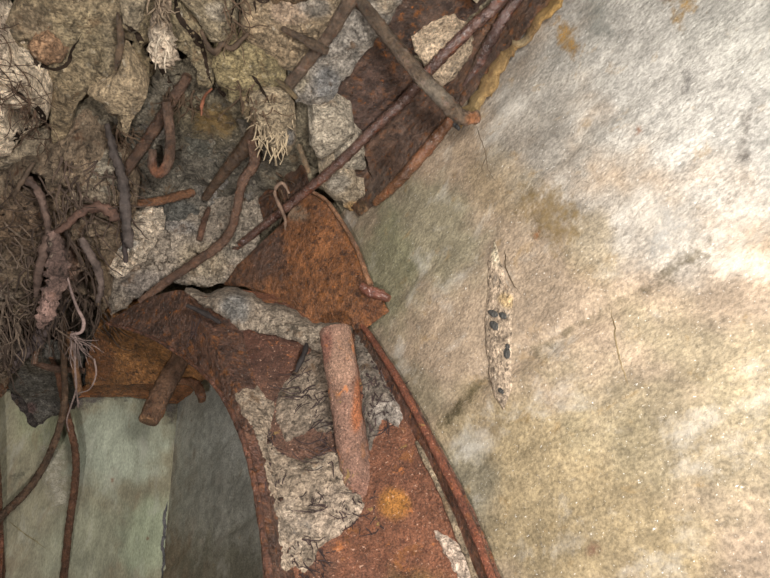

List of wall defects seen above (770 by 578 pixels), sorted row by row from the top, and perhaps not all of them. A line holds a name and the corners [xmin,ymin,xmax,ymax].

spalling [0,0,524,578]